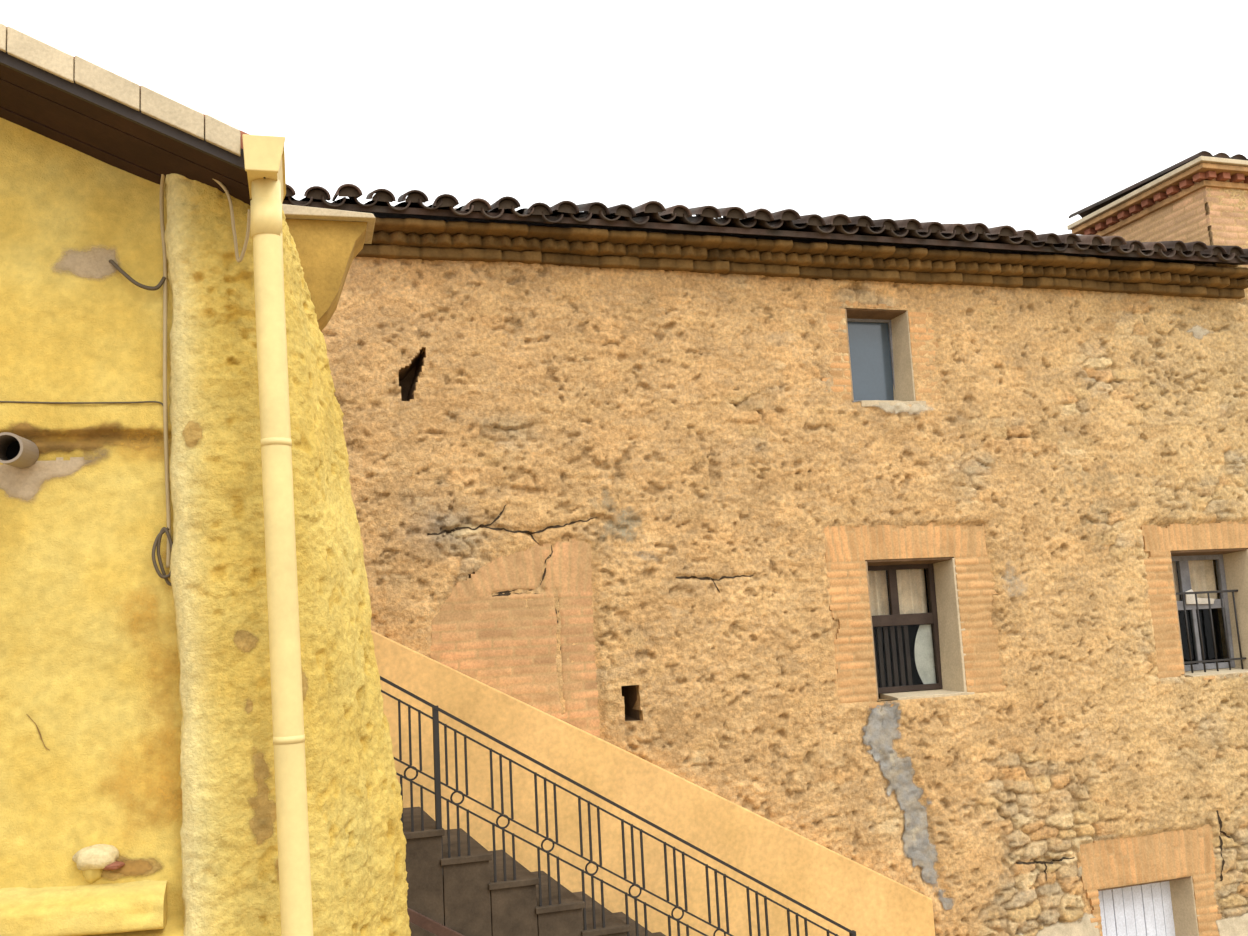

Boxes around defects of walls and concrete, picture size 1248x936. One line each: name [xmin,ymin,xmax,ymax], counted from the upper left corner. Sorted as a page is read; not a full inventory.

spalling [399,349,425,401]
crack [427,505,597,651]